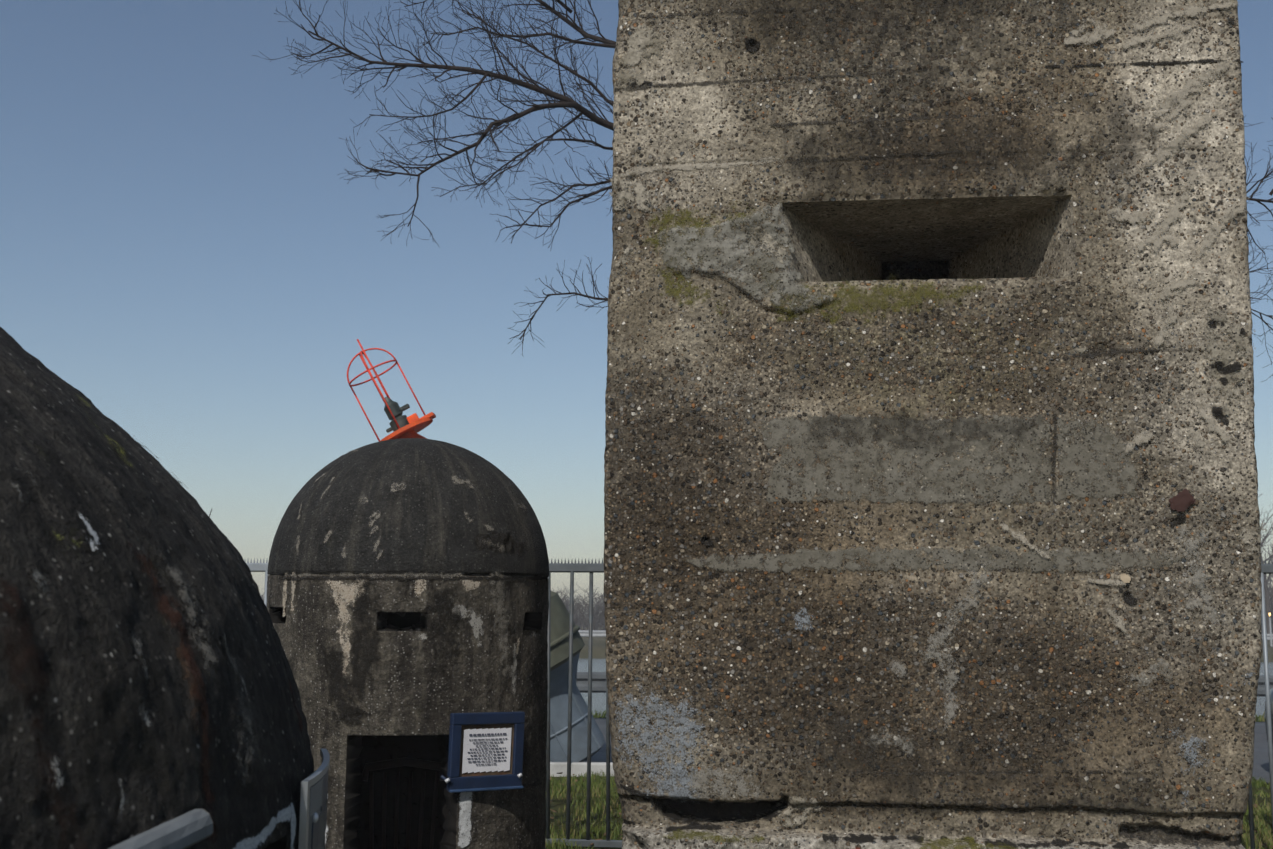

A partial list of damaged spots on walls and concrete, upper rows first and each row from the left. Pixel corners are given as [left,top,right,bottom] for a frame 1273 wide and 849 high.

rust [1169,489,1196,511]